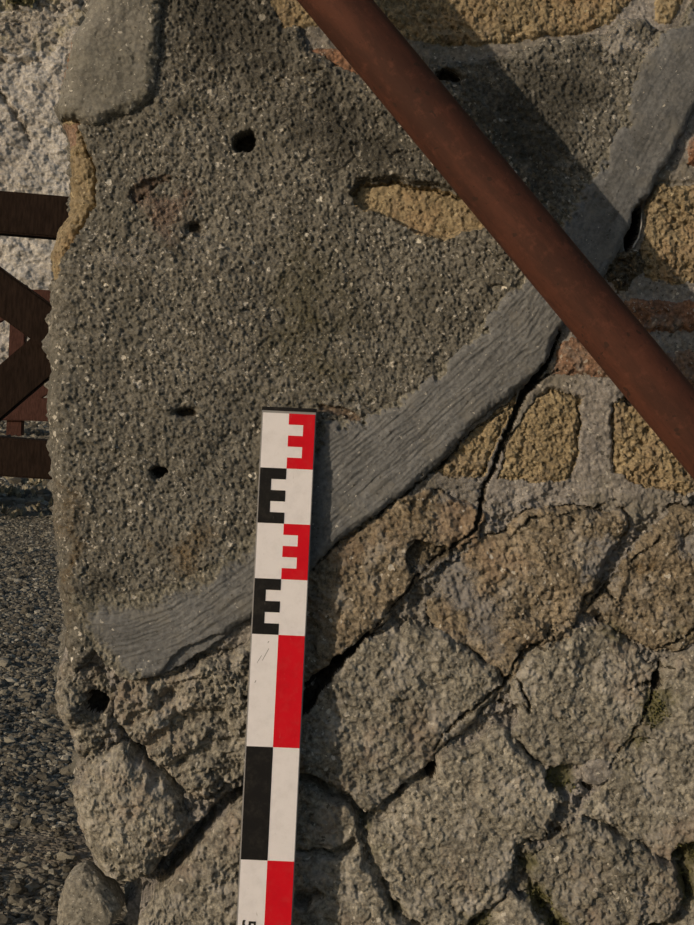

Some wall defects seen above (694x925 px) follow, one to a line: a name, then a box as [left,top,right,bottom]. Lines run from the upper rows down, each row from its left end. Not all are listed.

spalling [352,179,485,242]
spalling [606,250,646,294]
crack [302,329,561,717]
crack [511,499,617,539]
crack [587,536,663,609]
crack [434,625,556,751]
crack [613,628,694,761]
crack [528,825,570,844]